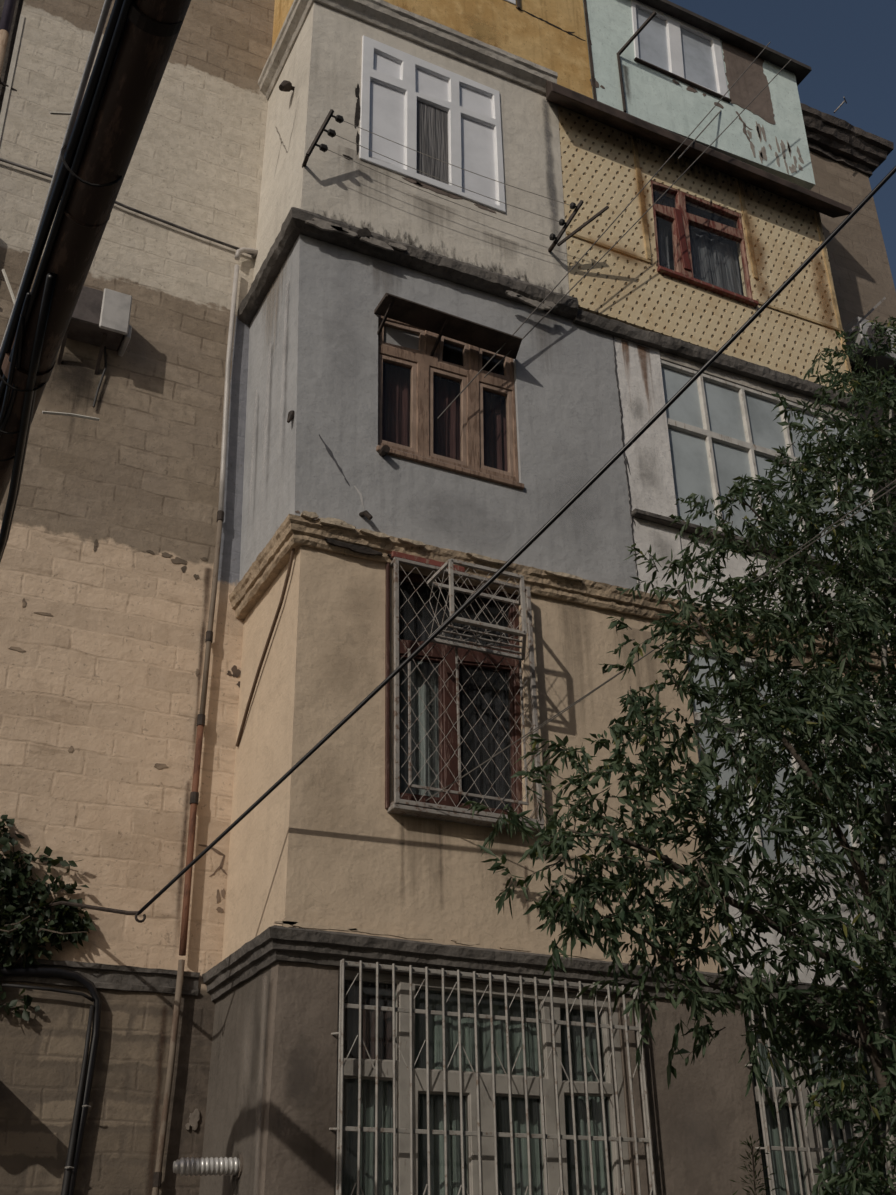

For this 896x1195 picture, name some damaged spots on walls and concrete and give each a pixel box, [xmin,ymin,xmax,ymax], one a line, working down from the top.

peeling [672,40,804,174]
spalling [147,550,207,580]